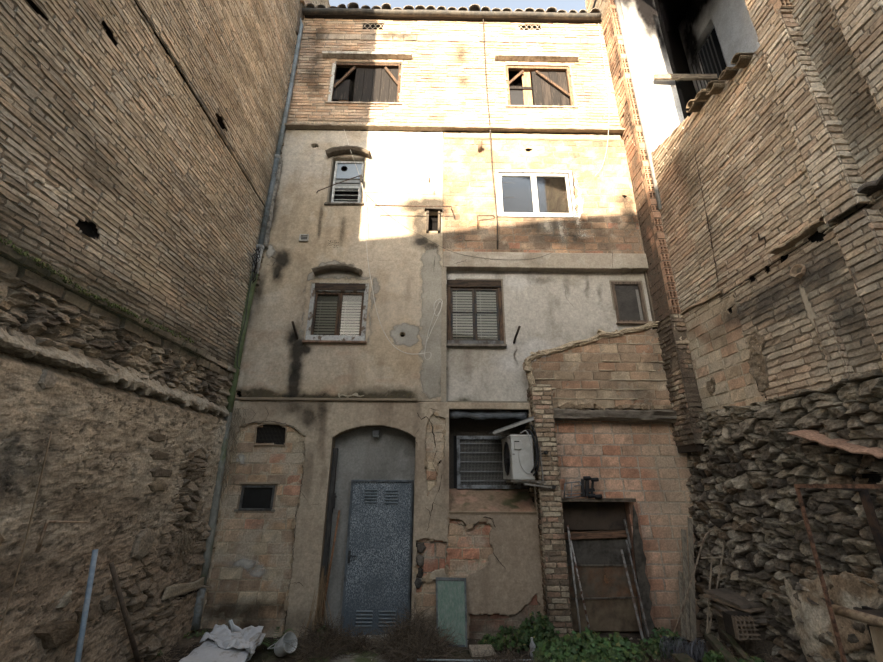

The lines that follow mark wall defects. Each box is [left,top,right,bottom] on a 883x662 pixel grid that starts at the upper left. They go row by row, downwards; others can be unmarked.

damp [273,250,289,280]
damp [238,330,415,425]
crack [414,408,442,528]
spalling [413,517,493,632]
spalling [469,594,543,639]